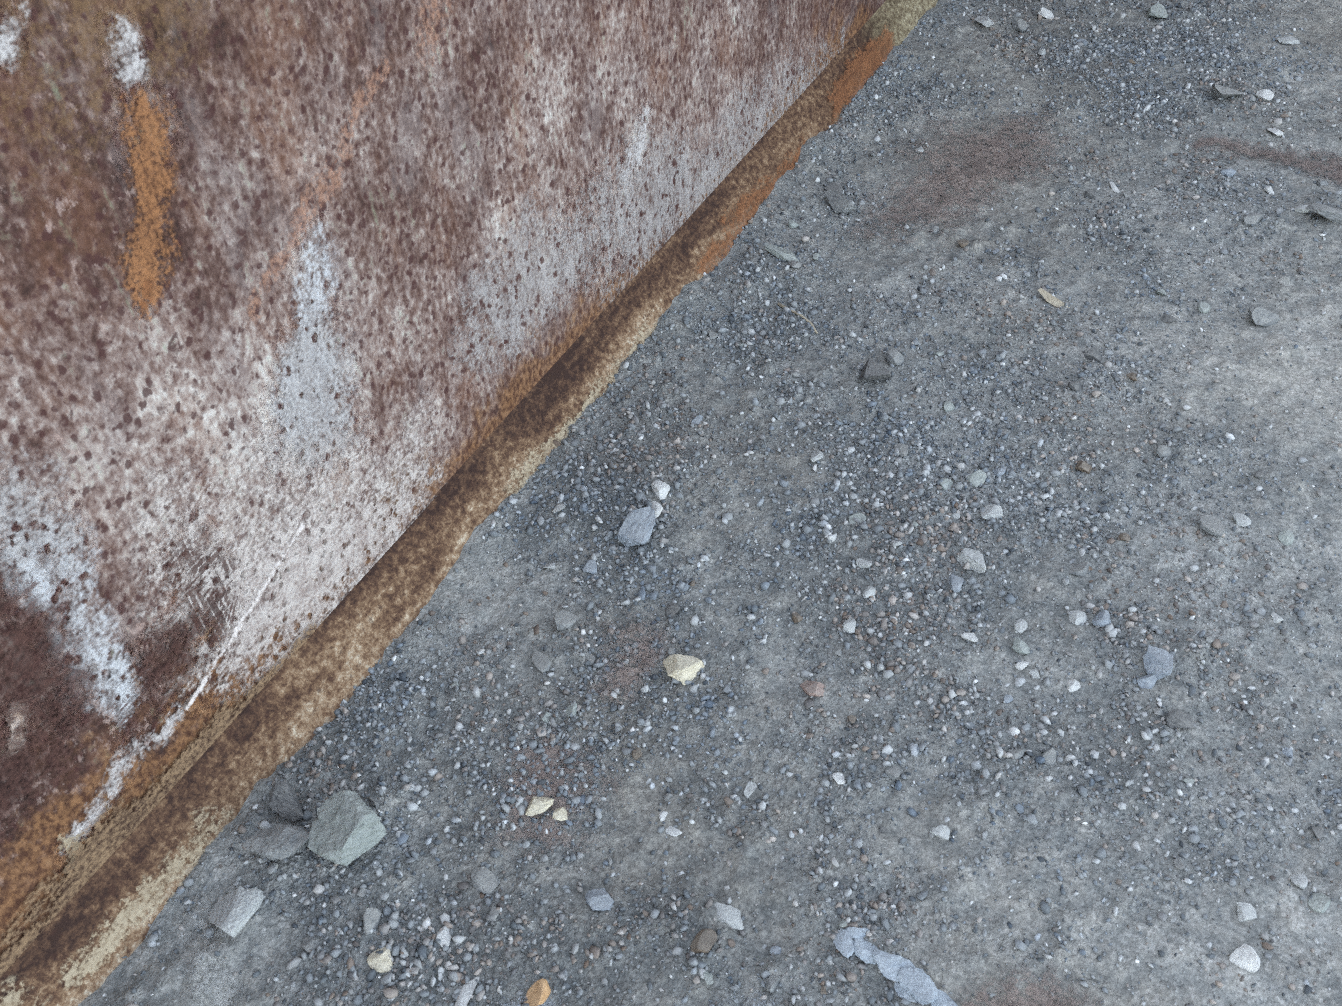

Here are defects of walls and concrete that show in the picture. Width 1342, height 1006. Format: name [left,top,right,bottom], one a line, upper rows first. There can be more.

rust [828,29,893,121]
rust [120,90,177,319]
rust [697,141,805,273]
rust [874,120,1050,221]
rust [166,521,241,661]
rust [0,557,91,843]
rust [0,623,316,977]
rust [511,746,580,840]